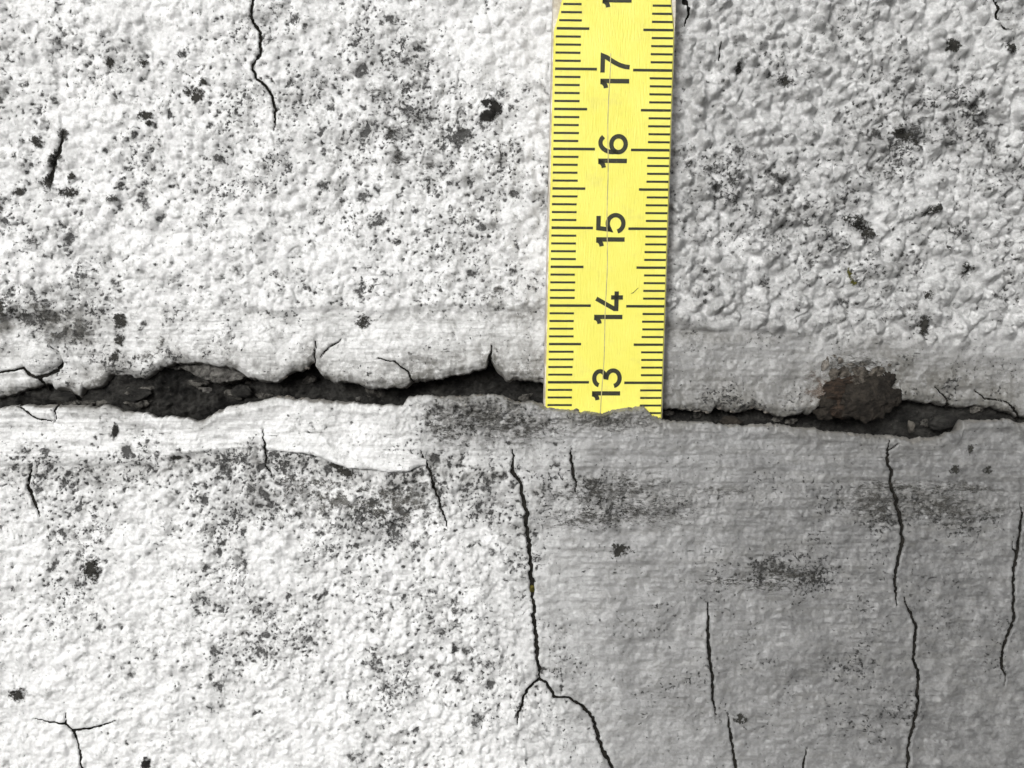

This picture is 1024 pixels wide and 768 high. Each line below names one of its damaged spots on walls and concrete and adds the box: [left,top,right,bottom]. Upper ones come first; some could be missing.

crack [250,0,278,131]
crack [0,339,579,422]
rust [807,354,902,424]
crack [26,464,40,517]
crack [421,451,447,527]
crack [510,448,614,768]
crack [627,387,1024,768]
crack [35,713,116,768]